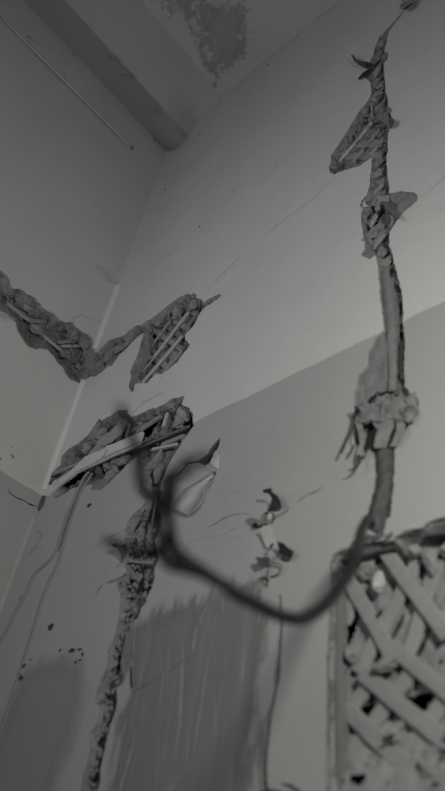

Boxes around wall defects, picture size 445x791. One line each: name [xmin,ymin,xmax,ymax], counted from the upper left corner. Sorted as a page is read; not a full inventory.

peeling [155,0,255,89]
flaking render [0,270,221,391]
spalling [329,12,445,551]
flaking render [37,396,194,511]
peeling [176,438,220,516]
peeling [241,488,294,598]
flaking render [80,493,283,791]
spalling [326,604,336,791]